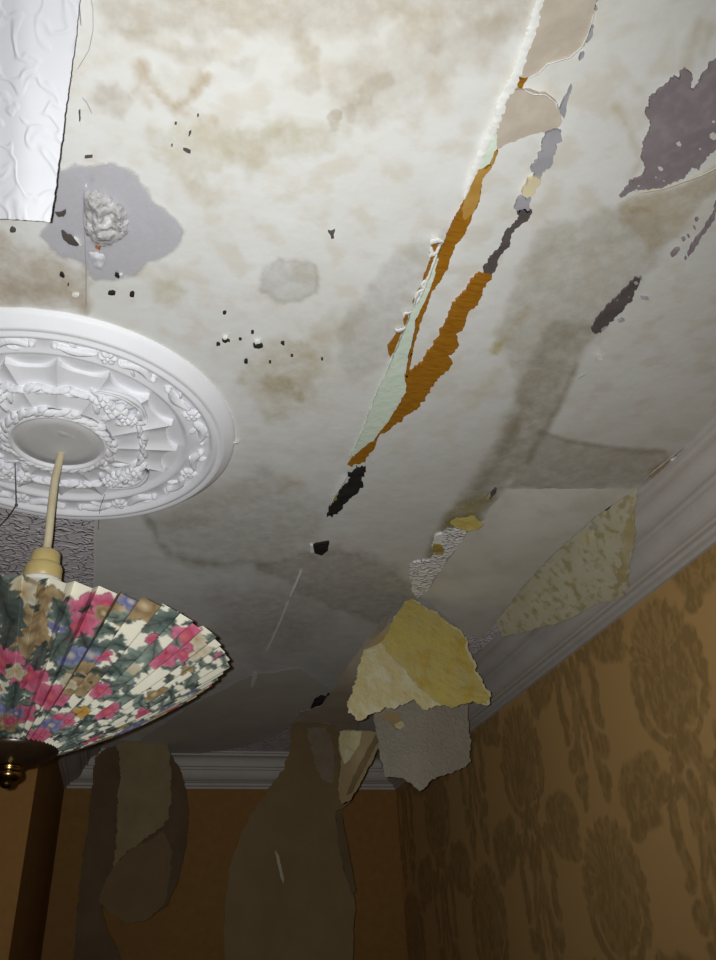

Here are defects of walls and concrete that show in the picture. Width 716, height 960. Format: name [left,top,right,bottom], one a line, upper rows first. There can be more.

peeling [619,58,716,198]
flaking render [61,184,129,270]
peeling [670,200,716,260]
peeling [216,330,263,349]